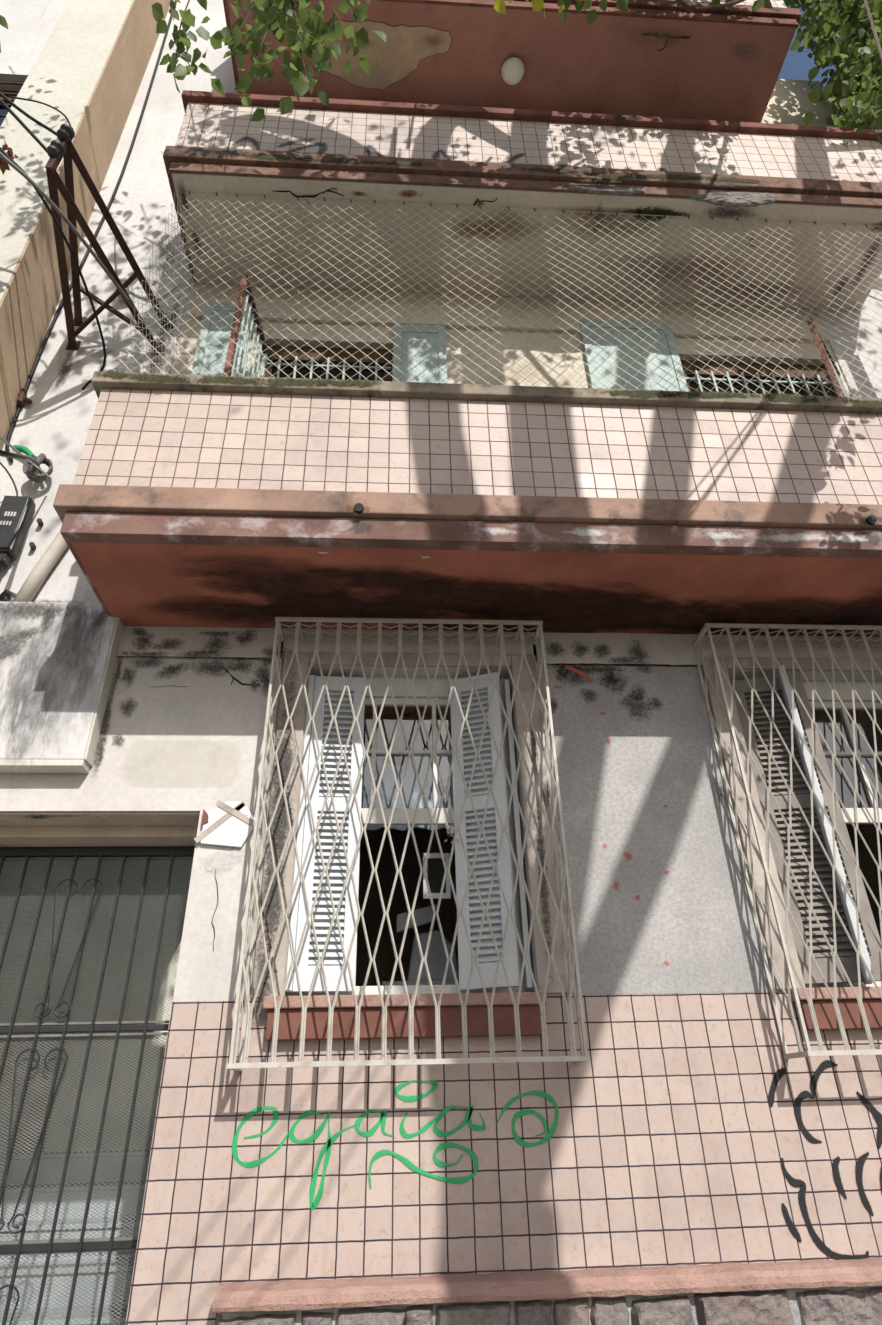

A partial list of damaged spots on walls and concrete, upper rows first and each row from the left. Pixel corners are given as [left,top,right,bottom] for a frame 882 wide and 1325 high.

peeling [315,20,453,90]
crack [642,33,690,51]
crack [274,188,344,204]
damp [0,598,106,665]
damp [113,561,882,716]
damp [254,675,294,1024]
damp [536,785,551,955]